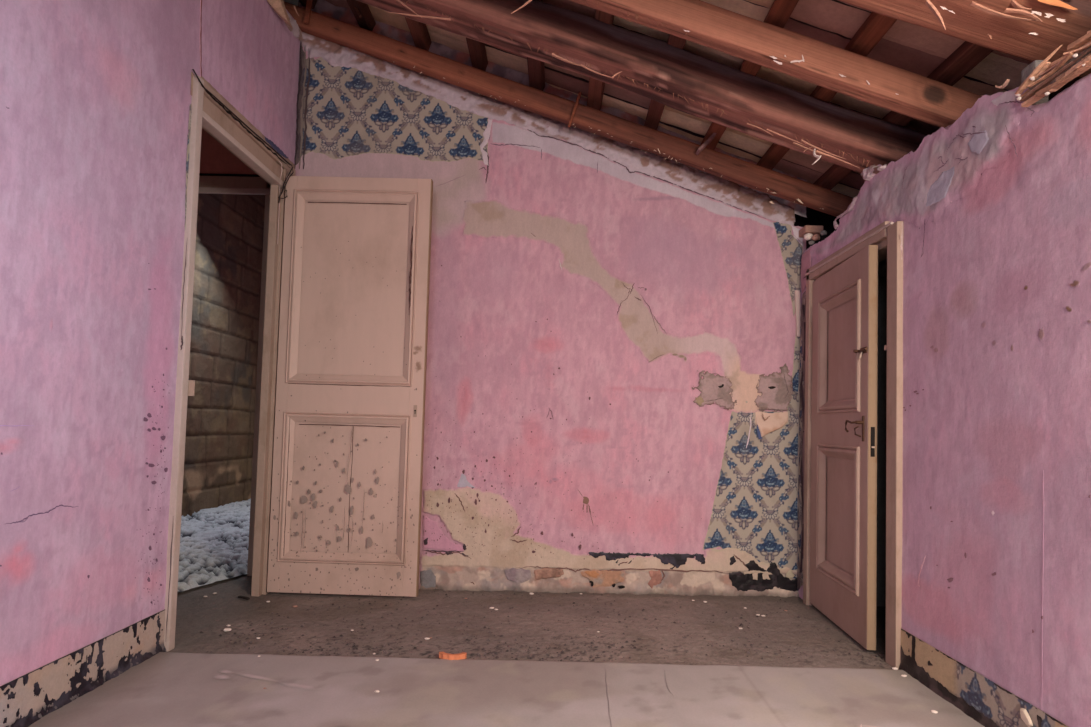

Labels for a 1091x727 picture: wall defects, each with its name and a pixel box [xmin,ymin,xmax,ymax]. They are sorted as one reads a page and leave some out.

flaking render [300,32,858,238]
flaking render [861,164,887,181]
flaking render [692,370,737,410]
flaking render [754,363,794,413]
crack [6,505,78,524]
flaking render [419,474,799,597]
peeling [0,610,165,727]
peeling [899,629,999,727]
peeling [994,683,1065,727]